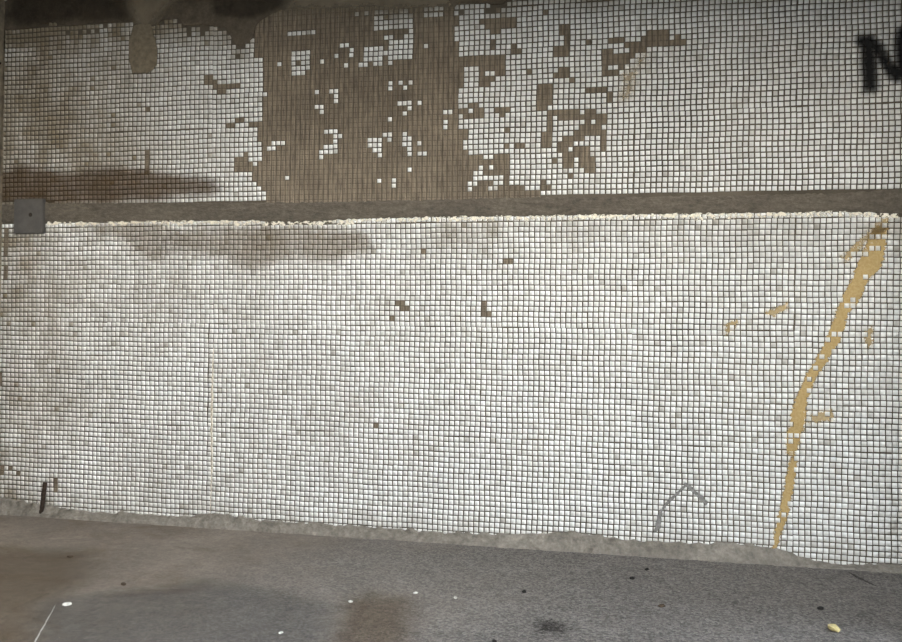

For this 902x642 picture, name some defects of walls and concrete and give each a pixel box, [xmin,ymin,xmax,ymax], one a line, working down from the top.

peeling [226,6,552,203]
peeling [536,24,613,179]
peeling [602,29,686,76]
damp [2,169,216,203]